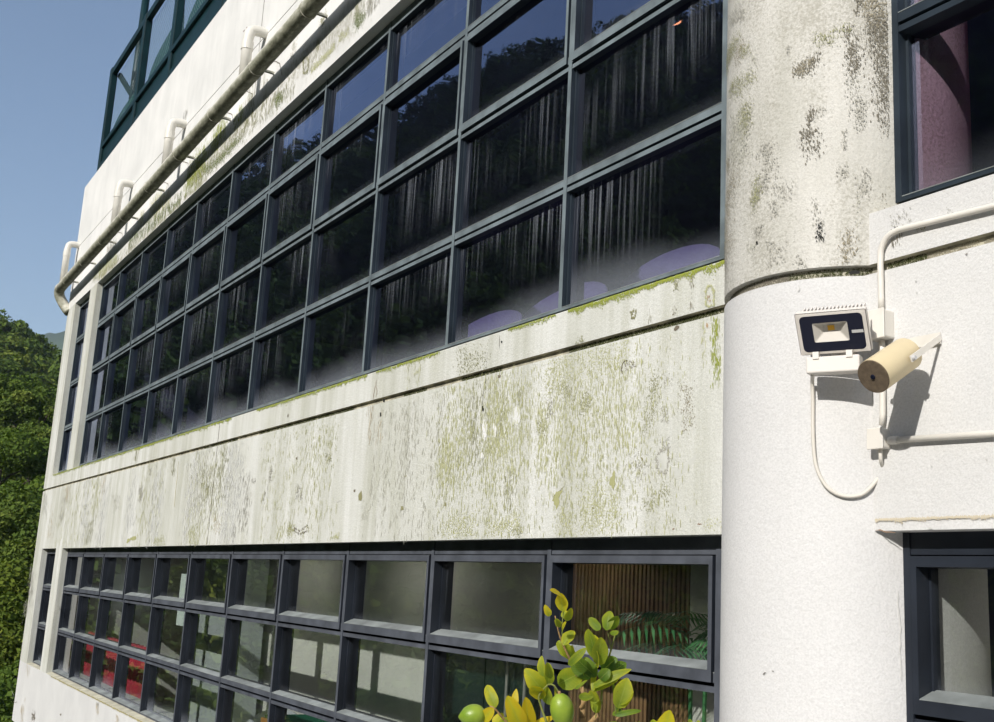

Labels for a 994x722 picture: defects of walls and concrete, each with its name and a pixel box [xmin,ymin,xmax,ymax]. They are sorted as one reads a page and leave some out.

leakage [92,0,380,283]
mould [723,0,807,280]
mould [799,105,826,165]
mould [786,0,890,150]
mould [836,165,926,264]
leakage [182,441,271,545]
leakage [361,386,449,541]
leakage [480,388,523,459]
leakage [626,368,695,511]